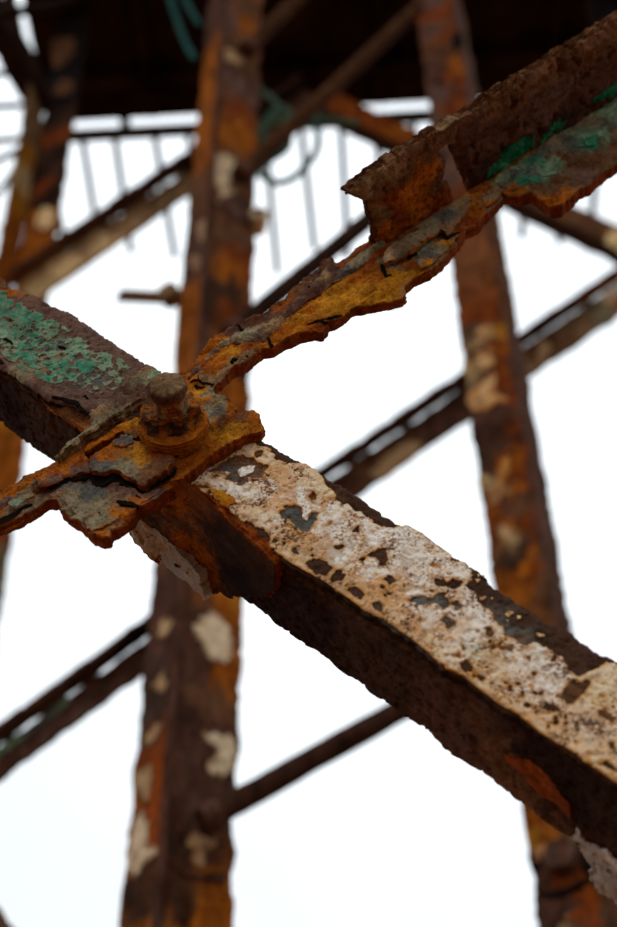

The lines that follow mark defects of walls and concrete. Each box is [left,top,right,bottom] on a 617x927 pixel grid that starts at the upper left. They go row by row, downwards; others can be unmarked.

peeling [486,81,617,191]
peeling [35,206,56,231]
peeling [45,195,151,278]
peeling [186,218,206,272]
corrosion [383,134,554,270]
peeling [0,290,131,394]
corrosion [0,513,37,534]
corrosion [7,417,176,532]
corrosion [211,489,237,507]
peeling [192,440,617,783]
corrosion [147,753,163,849]
corrosion [504,754,572,820]